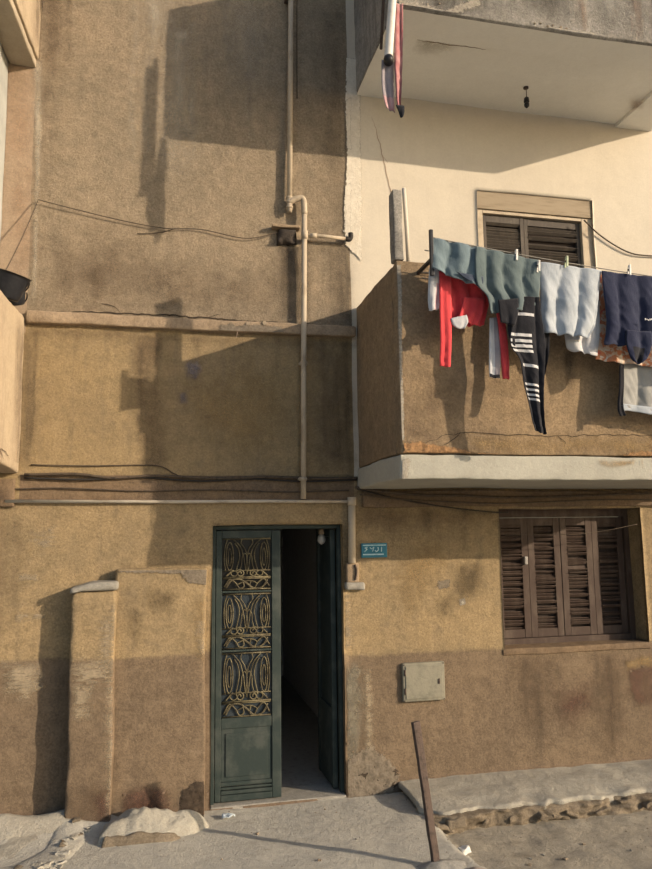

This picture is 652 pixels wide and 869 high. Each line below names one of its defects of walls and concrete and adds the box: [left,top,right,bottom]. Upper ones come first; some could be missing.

crack [372,119,391,192]
crack [424,432,652,447]
flaking render [123,781,209,817]